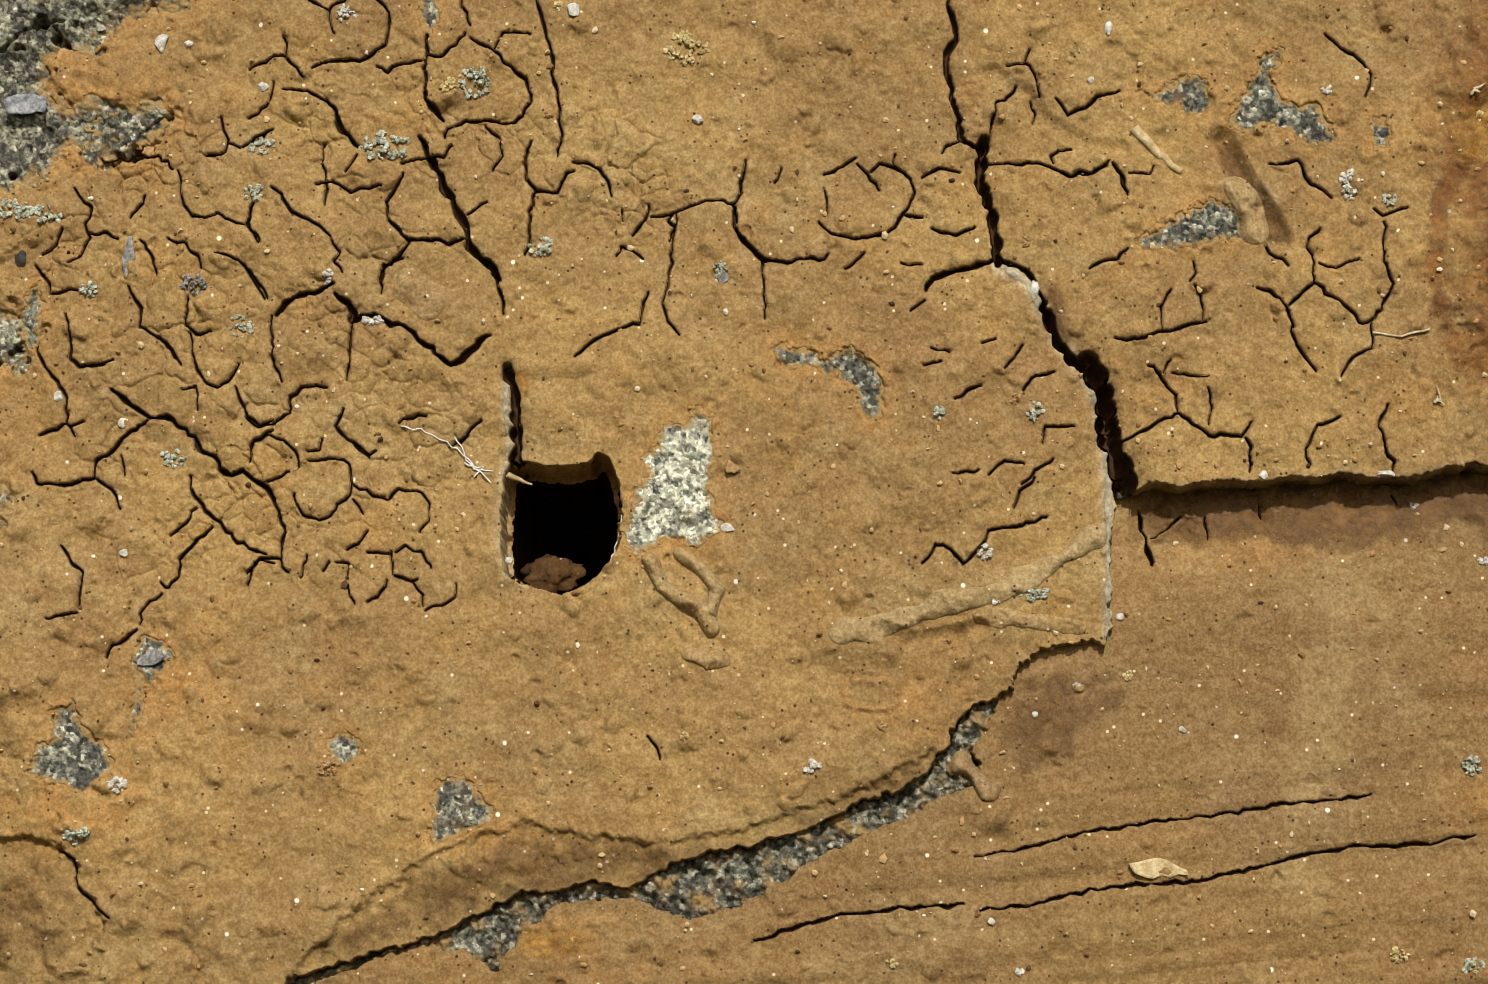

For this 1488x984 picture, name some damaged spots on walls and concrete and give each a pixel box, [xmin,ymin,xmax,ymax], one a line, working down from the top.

peeling [4,93,48,115]
spalling [1228,46,1336,151]
crack [1324,35,1372,98]
spalling [1134,197,1244,253]
crack [1256,160,1407,376]
crack [33,0,1261,658]
spalling [617,406,724,557]
crack [1378,405,1397,506]
spalling [28,701,114,792]
spalling [427,775,496,845]
crack [975,794,1371,857]
crack [754,837,1468,941]